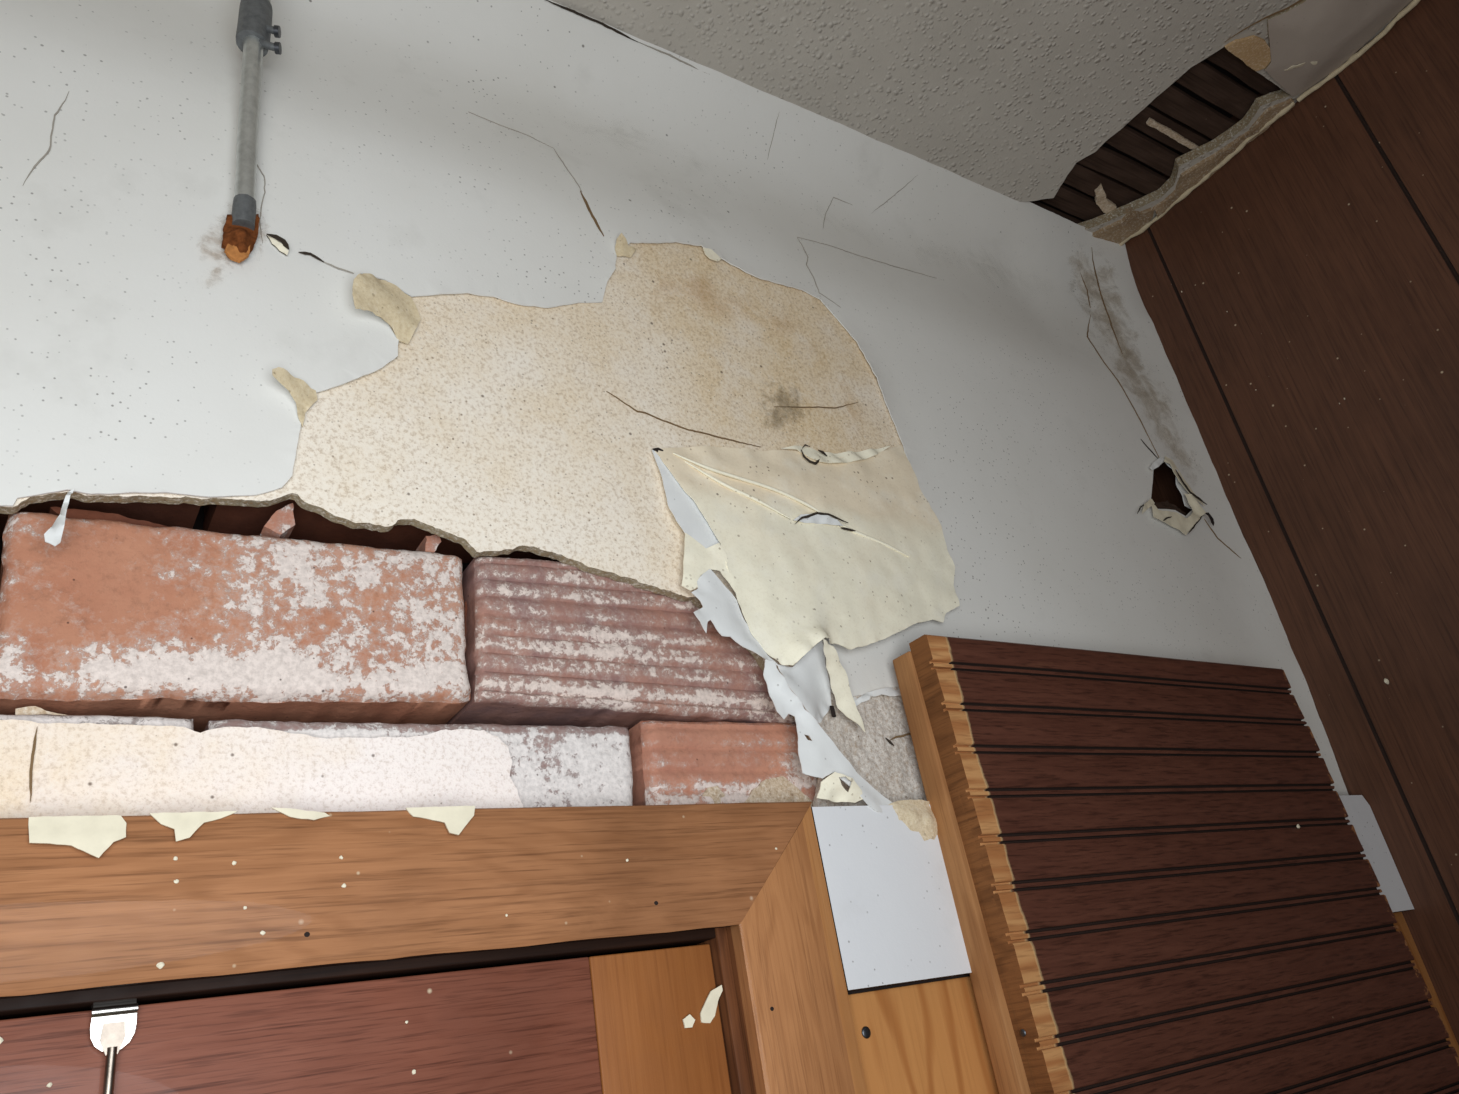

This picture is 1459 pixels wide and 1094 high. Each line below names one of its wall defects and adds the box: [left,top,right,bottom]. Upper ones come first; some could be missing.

crack [546,0,705,73]
spalling [1225,35,1317,71]
crack [23,92,69,185]
crack [469,112,604,236]
corrosion [221,214,260,263]
crack [797,177,935,308]
spalling [1137,456,1214,535]
spalling [0,233,960,858]